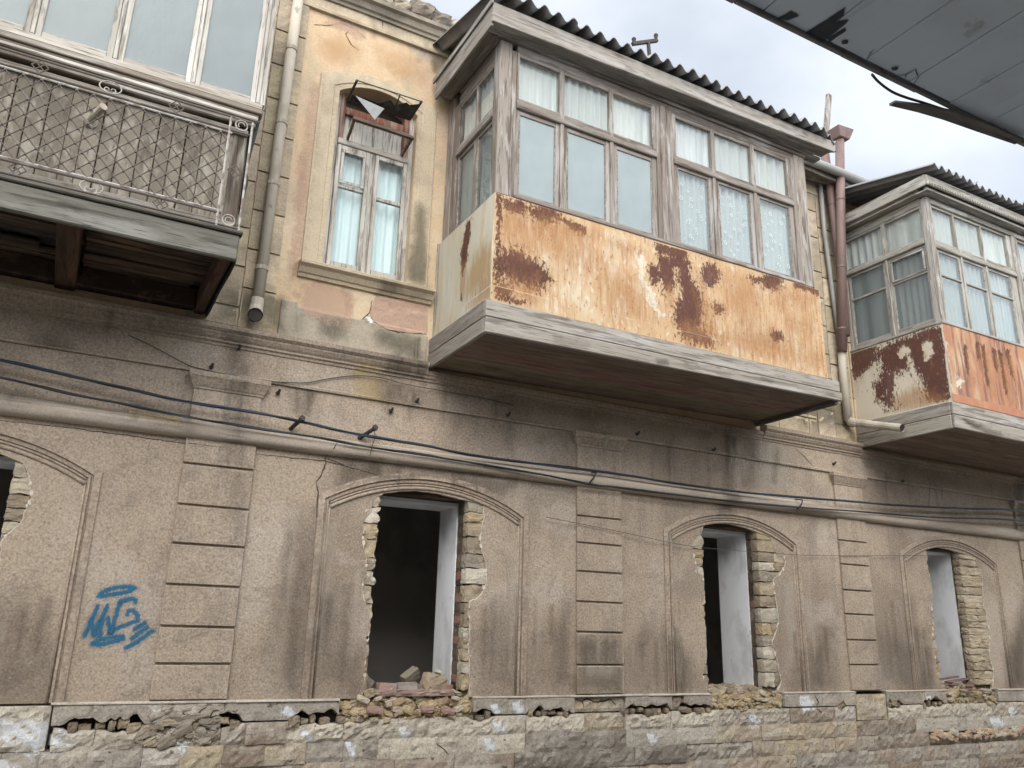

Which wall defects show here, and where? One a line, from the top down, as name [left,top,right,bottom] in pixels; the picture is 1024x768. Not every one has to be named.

corrosion [460,219,471,277]
corrosion [491,193,587,305]
corrosion [636,242,726,350]
corrosion [851,324,1015,413]
spalling [0,461,33,559]
crack [260,442,395,517]
spalling [335,495,487,723]
spalling [692,527,786,726]
spalling [929,552,998,706]
spalling [137,706,225,754]